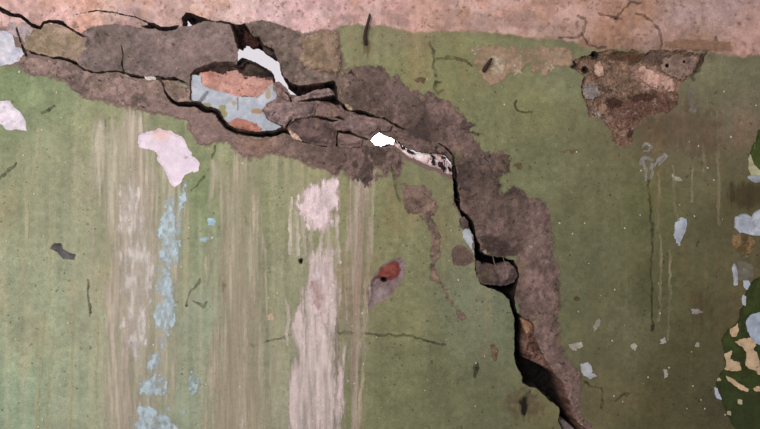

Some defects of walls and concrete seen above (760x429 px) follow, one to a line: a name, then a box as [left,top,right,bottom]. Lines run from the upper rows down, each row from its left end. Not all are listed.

leakage [92,108,186,429]
peeling [131,406,178,429]
peeling [137,128,200,396]
crack [0,6,405,147]
spalling [0,20,466,320]
leakage [285,178,374,429]
spalling [452,229,475,266]
crack [438,143,586,429]
spalling [470,39,732,147]
peeling [674,217,687,246]
peeling [714,209,760,429]